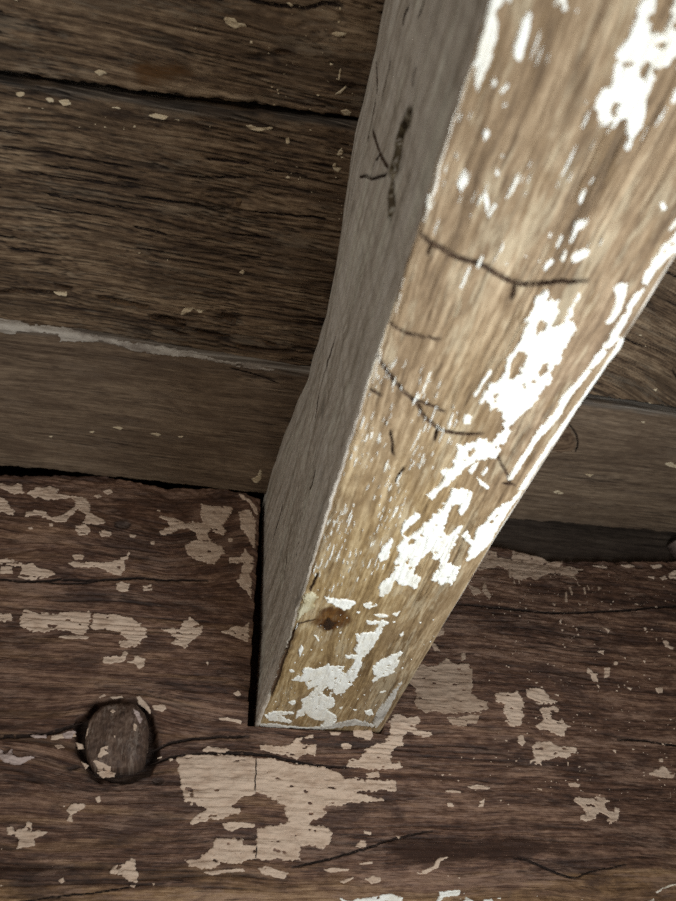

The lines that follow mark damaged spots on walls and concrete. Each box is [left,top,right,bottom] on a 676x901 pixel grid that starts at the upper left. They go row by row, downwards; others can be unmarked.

peeling [514,12,532,61]
peeling [594,0,676,151]
peeling [423,0,511,222]
peeling [0,483,113,537]
peeling [0,558,55,580]
peeling [150,218,676,879]
peeling [0,609,147,669]
rust [312,607,351,629]
crack [0,722,84,739]
peeling [110,858,139,888]
peeling [340,893,403,901]
crack [516,858,627,878]